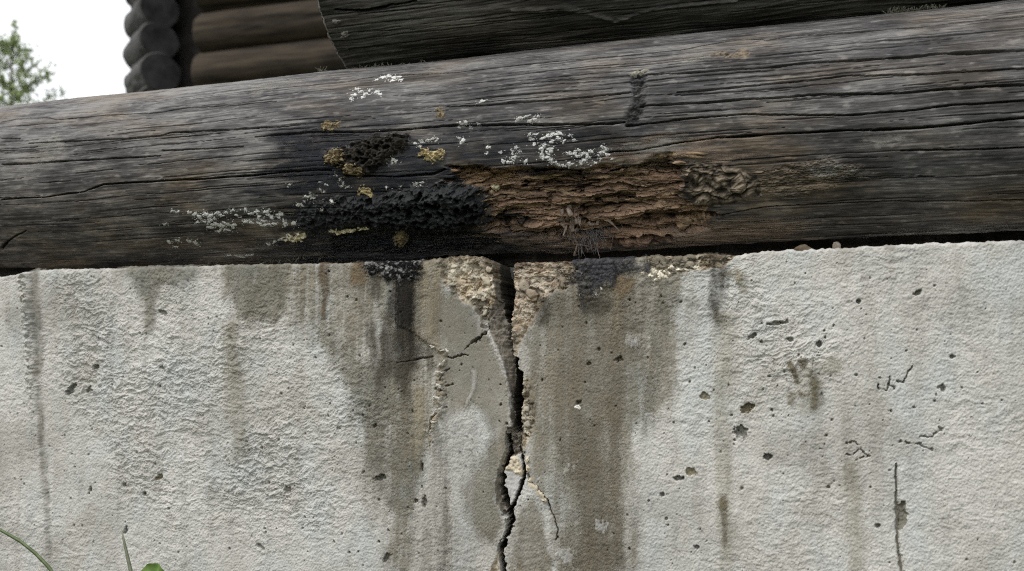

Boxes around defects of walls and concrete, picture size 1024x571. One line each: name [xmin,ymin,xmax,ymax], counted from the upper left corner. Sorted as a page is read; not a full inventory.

damp [126,265,194,327]
spalling [438,255,580,356]
damp [224,258,512,569]
crack [480,264,559,571]
damp [510,253,746,571]
crack [877,366,912,391]
crack [894,426,943,571]